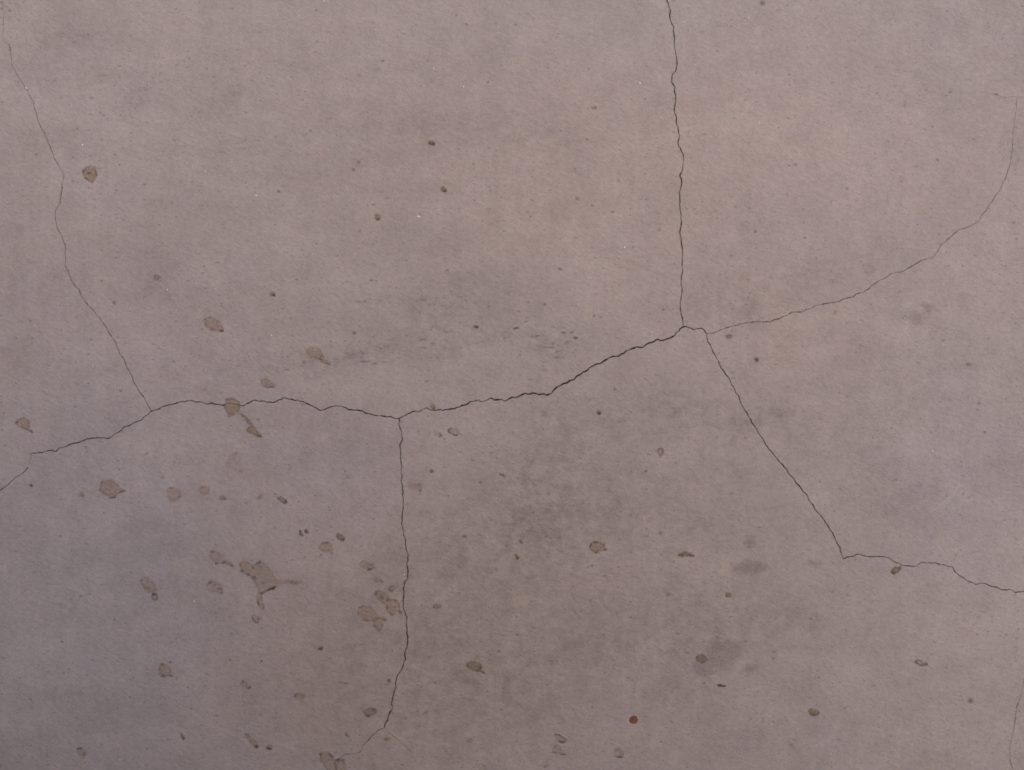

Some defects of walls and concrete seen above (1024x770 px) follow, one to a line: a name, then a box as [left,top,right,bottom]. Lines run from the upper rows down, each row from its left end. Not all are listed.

crack [39,1,1024,593]
crack [369,482,409,739]